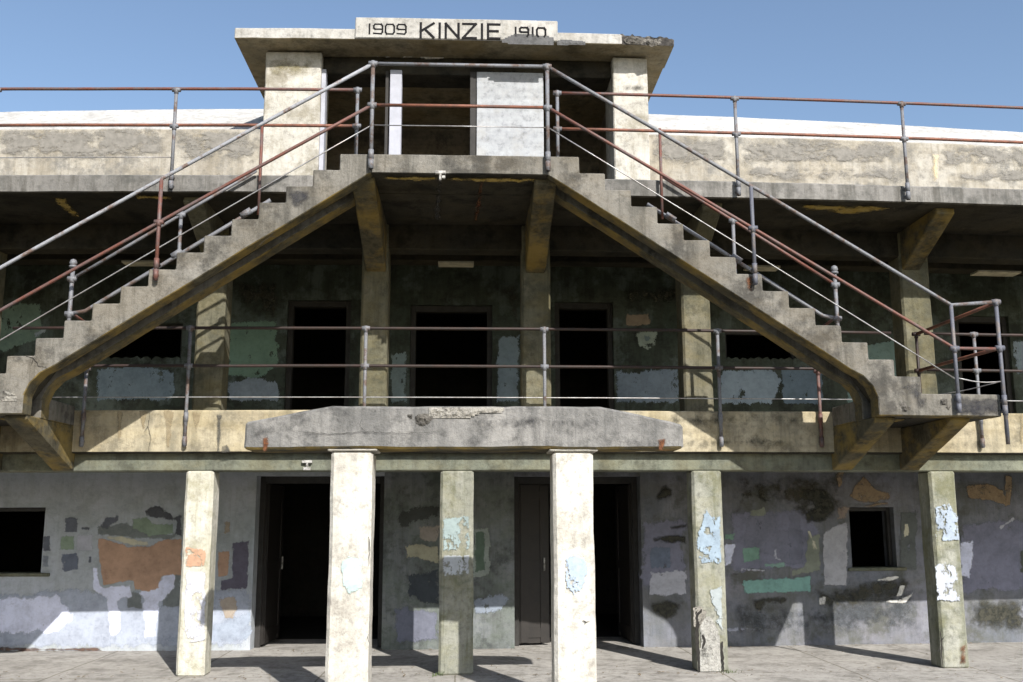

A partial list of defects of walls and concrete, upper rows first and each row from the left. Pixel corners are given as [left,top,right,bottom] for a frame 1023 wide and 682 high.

spalling [407,407,504,426]
water stain [742,479,838,522]
peeling [967,476,1012,506]
water stain [973,601,1023,629]
spalling [693,606,721,672]